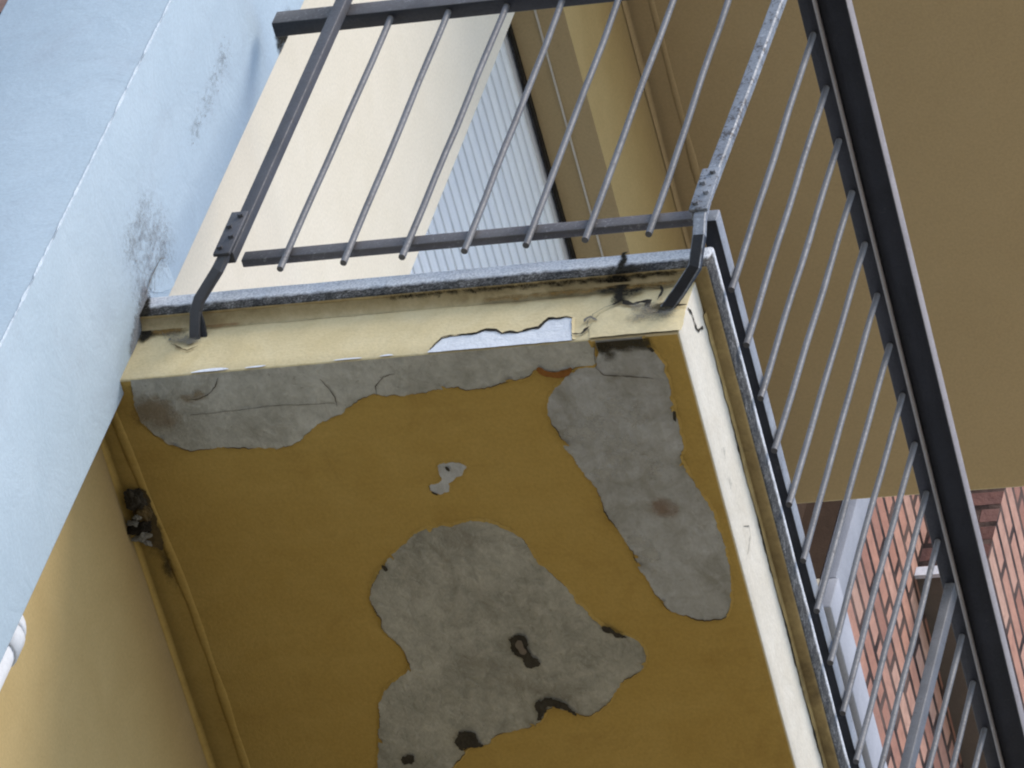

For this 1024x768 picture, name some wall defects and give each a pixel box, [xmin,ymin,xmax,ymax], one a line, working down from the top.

leakage [130,284,155,354]
leakage [391,252,676,302]
peeling [123,316,734,623]
peeling [367,518,649,768]